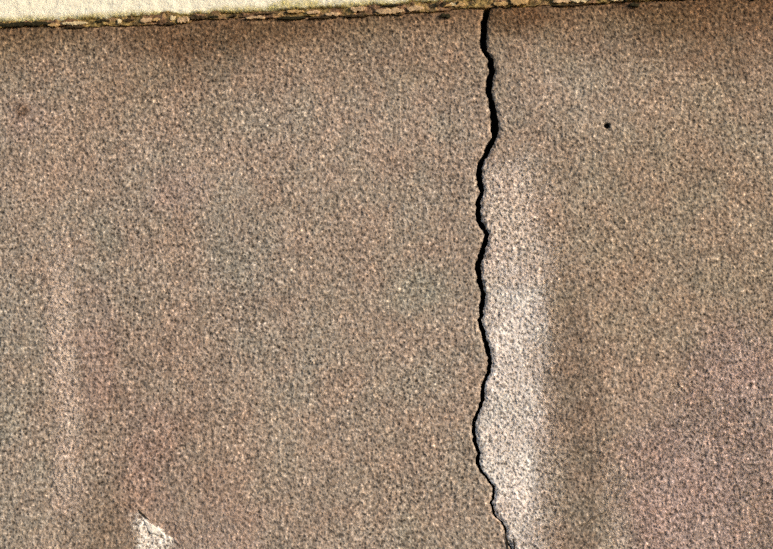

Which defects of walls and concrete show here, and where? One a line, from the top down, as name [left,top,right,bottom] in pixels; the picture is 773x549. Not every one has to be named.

crack [471,8,516,549]